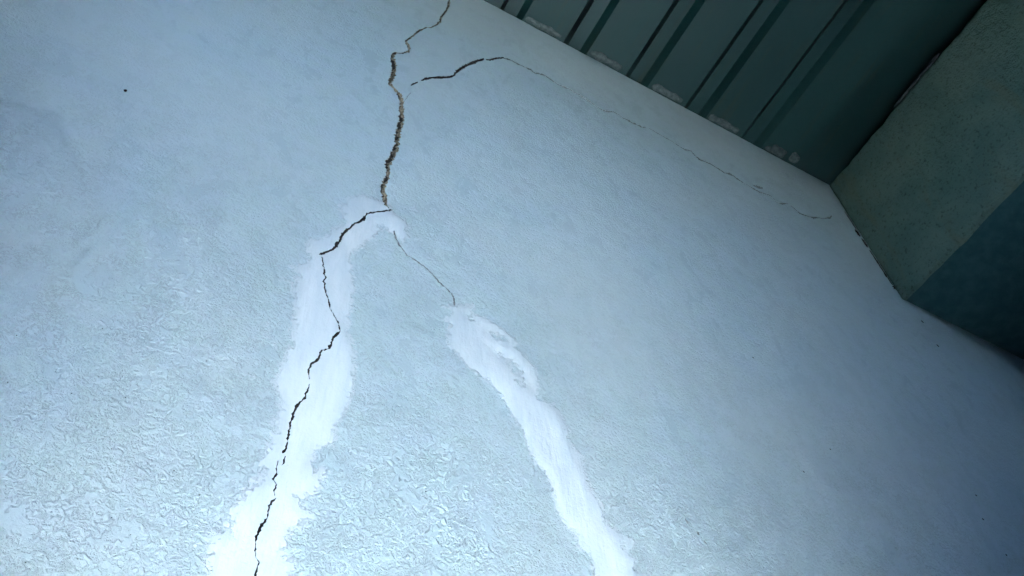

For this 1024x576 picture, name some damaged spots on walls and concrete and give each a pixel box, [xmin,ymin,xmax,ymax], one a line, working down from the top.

crack [254,0,832,576]